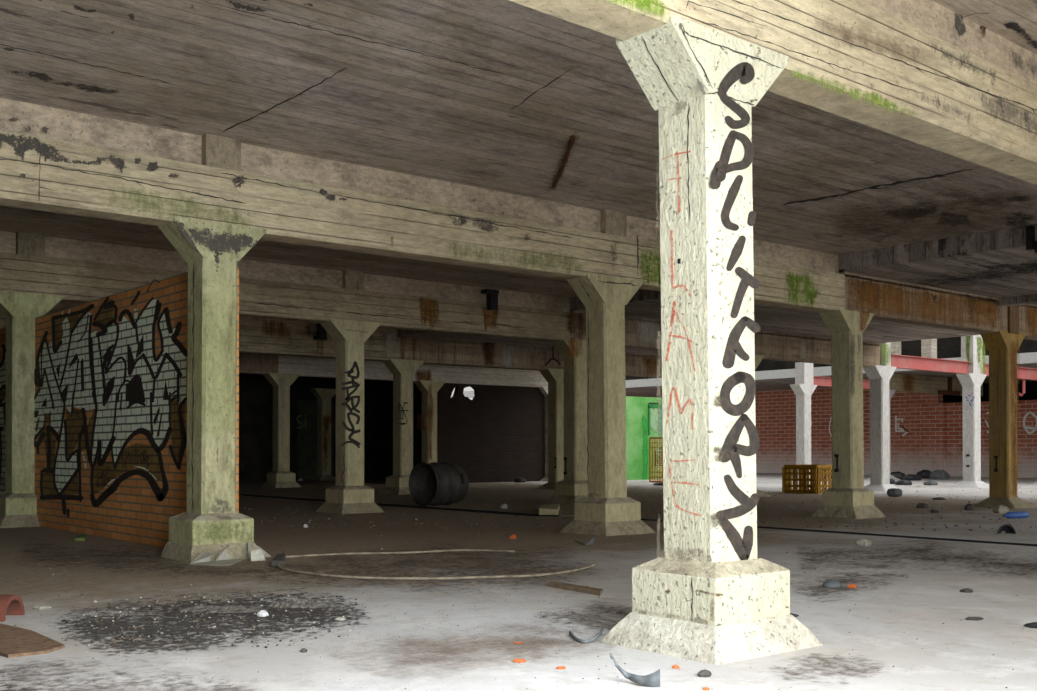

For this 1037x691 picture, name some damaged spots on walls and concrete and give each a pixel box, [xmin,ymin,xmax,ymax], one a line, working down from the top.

crack [223,68,346,132]
crack [641,0,1036,219]